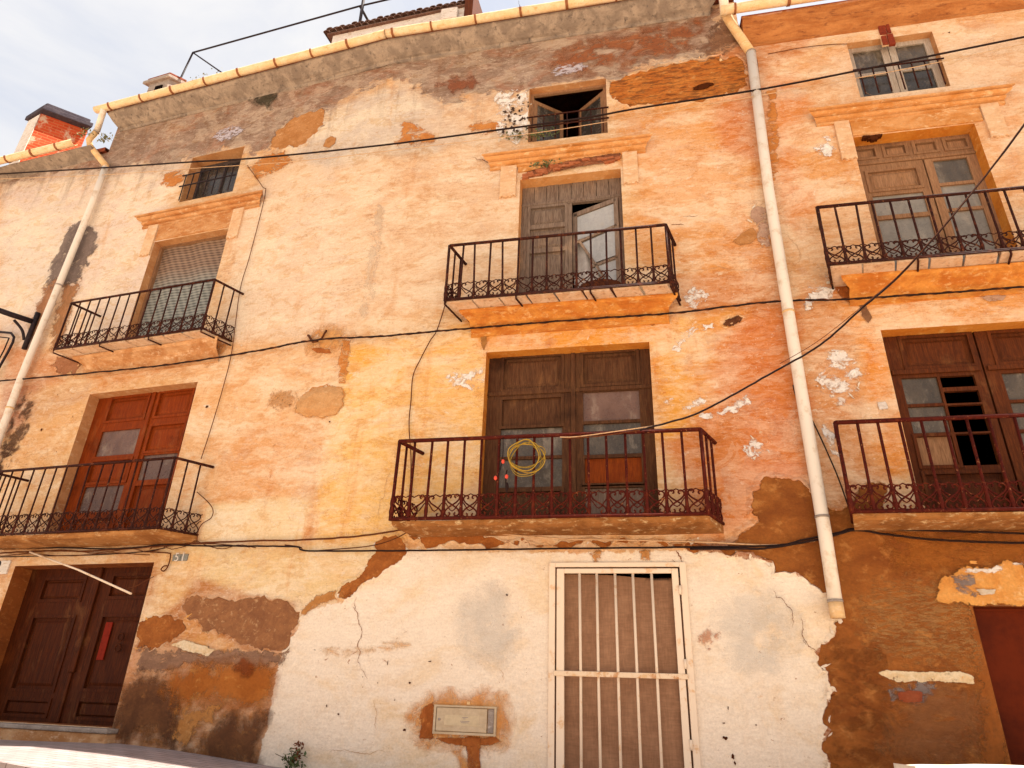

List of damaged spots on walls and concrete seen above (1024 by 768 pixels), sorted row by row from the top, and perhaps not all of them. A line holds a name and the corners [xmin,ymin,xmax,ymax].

peeling [247,106,336,179]
peeling [469,88,532,145]
flaking render [608,53,751,112]
water stain [31,221,97,350]
peeling [815,349,862,406]
water stain [111,646,289,764]
crack [330,604,382,754]
peeling [135,471,827,656]
peeling [812,477,1024,768]